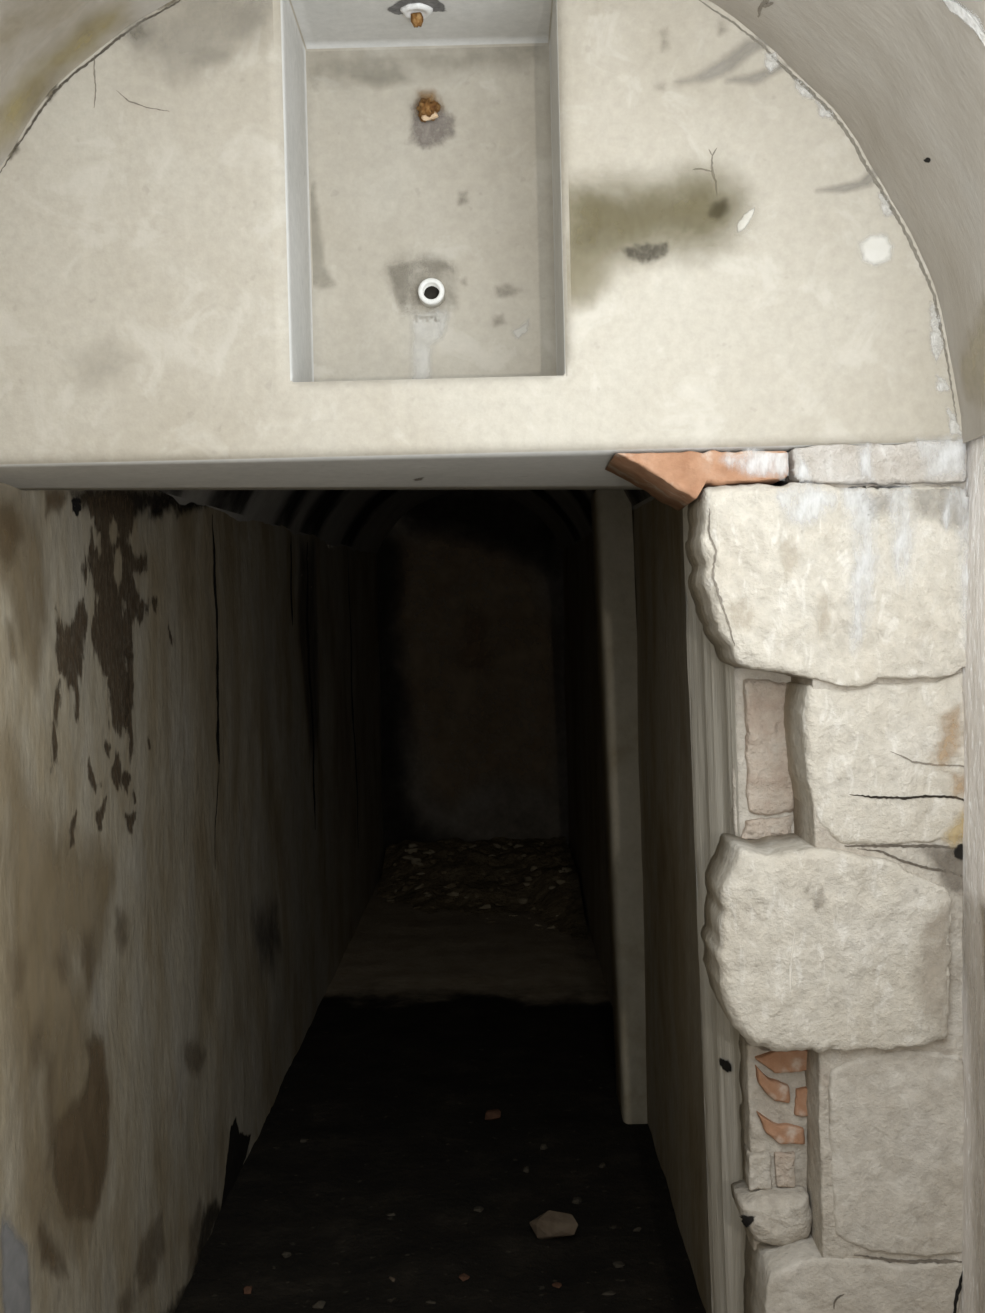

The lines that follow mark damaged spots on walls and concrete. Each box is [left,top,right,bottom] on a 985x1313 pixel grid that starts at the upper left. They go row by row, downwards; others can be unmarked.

corrosion [413,93,453,145]
leakage [569,180,730,286]
leakage [392,264,445,379]
peeling [51,490,157,832]
crack [849,751,964,801]
crack [845,844,957,871]
crack [856,1255,963,1313]